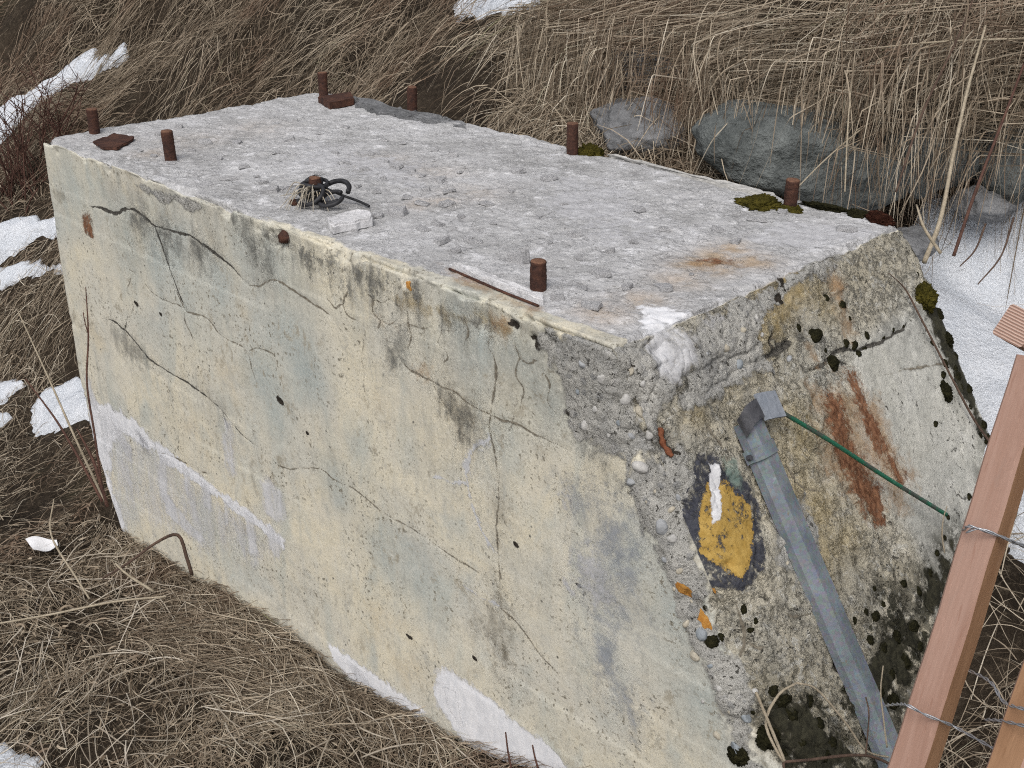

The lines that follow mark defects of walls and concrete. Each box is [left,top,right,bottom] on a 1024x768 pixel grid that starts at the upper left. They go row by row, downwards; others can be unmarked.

corrosion [82,214,94,238]
crack [89,205,557,673]
spalling [537,254,844,768]
corrosion [821,370,907,529]